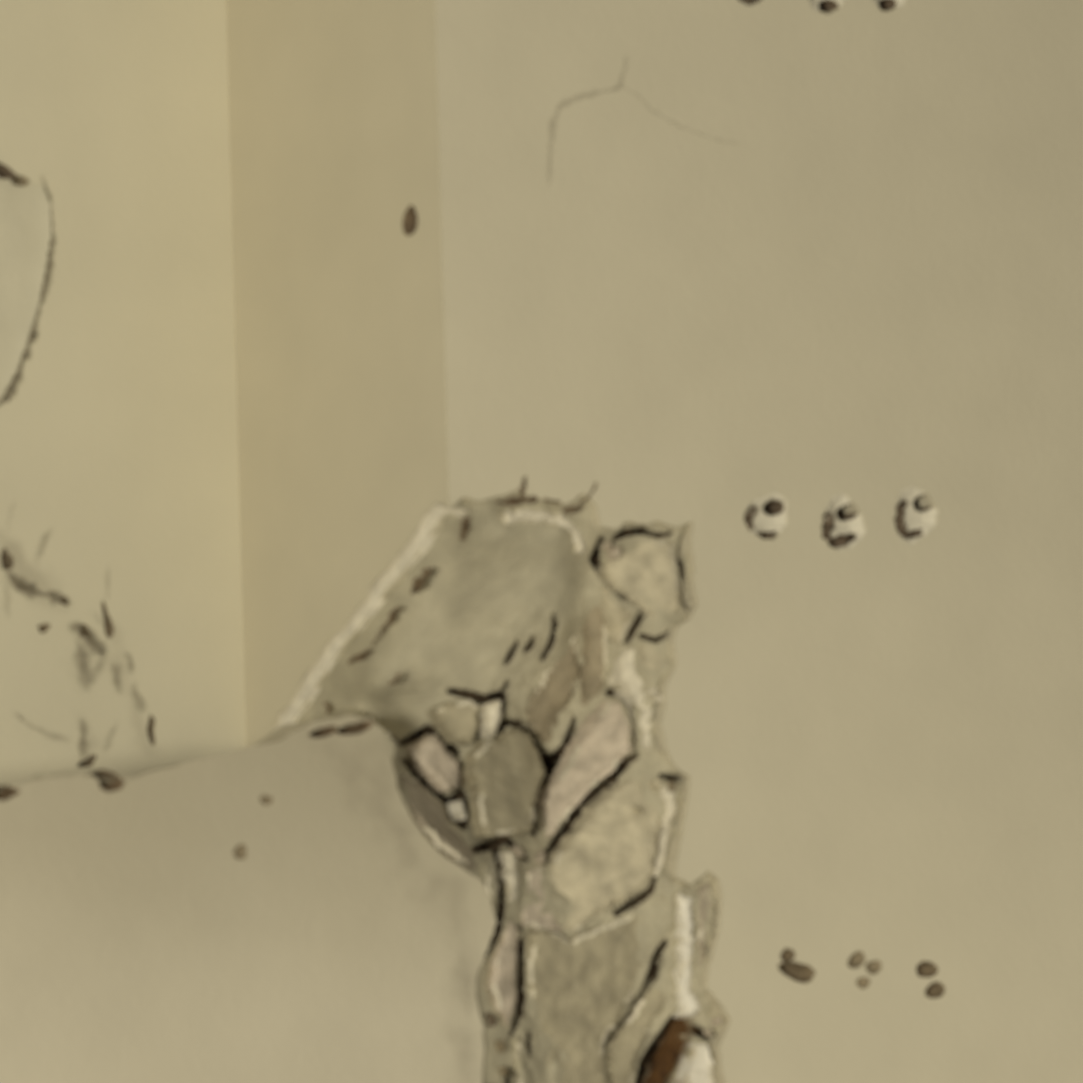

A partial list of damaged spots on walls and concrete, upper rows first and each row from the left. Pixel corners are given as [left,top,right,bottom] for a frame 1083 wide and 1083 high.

crack [1,548,114,645]
crack [147,714,155,746]
crack [309,721,374,738]
crack [77,755,97,768]
spalling [271,476,726,1083]
rust [664,1022,689,1077]